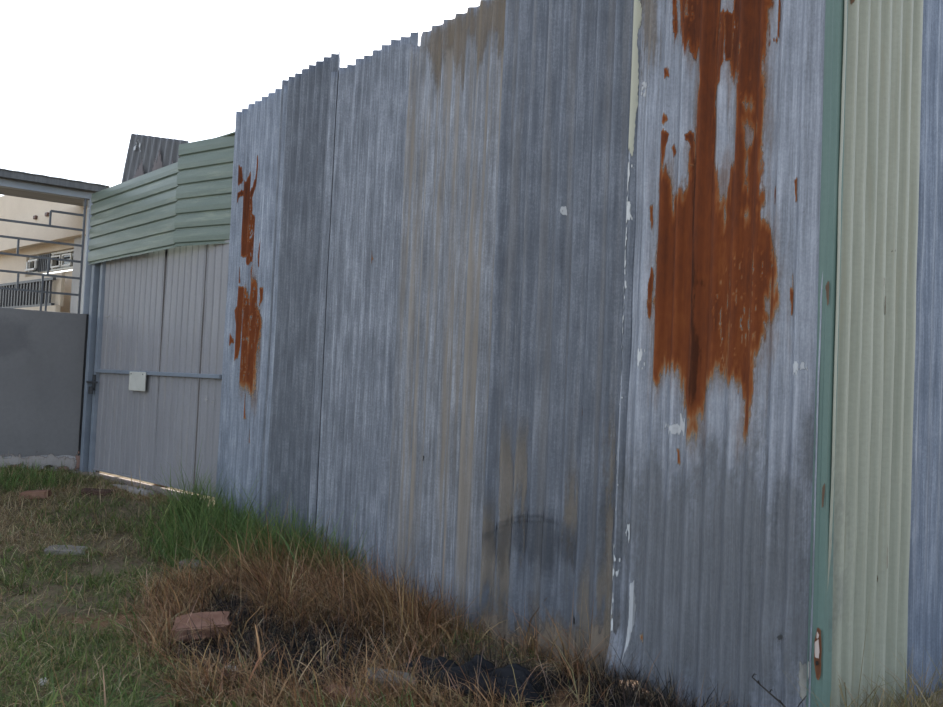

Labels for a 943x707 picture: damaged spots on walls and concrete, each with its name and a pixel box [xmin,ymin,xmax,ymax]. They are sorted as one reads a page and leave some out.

rust [229,155,263,419]
rust [647,0,793,443]
rust [814,628,822,680]